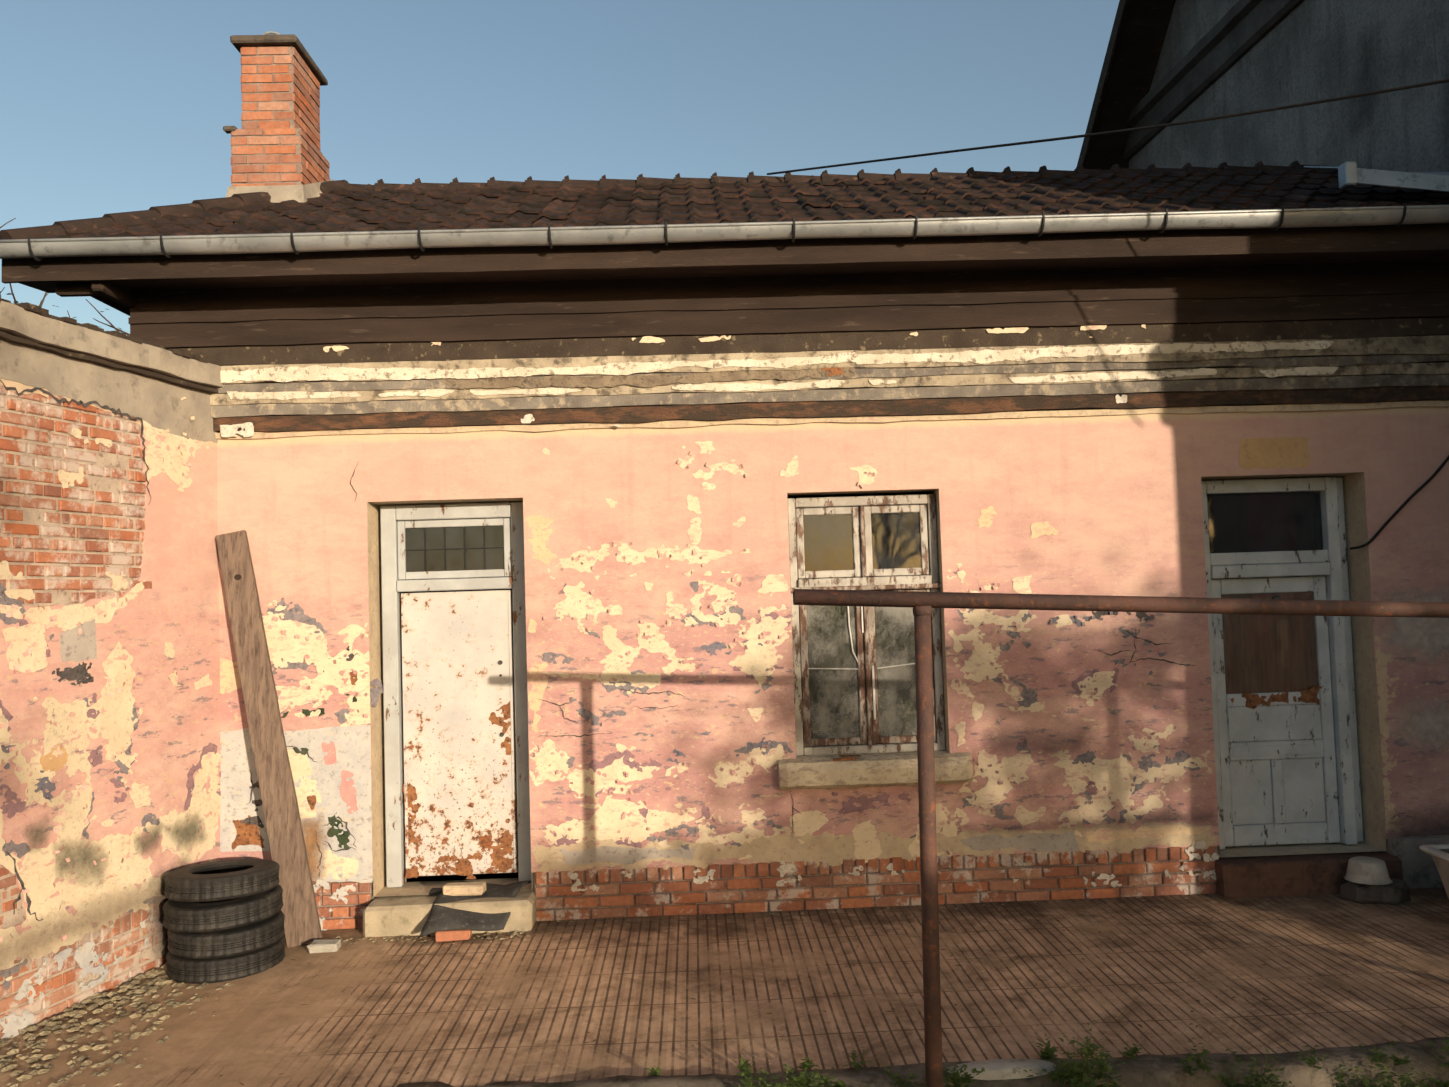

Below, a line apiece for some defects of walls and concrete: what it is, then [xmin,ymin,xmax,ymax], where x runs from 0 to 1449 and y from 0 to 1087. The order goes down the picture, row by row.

peeling [220,324,1338,404]
flaking render [0,384,271,1039]
flaking render [262,598,383,930]
peeling [524,441,1220,892]